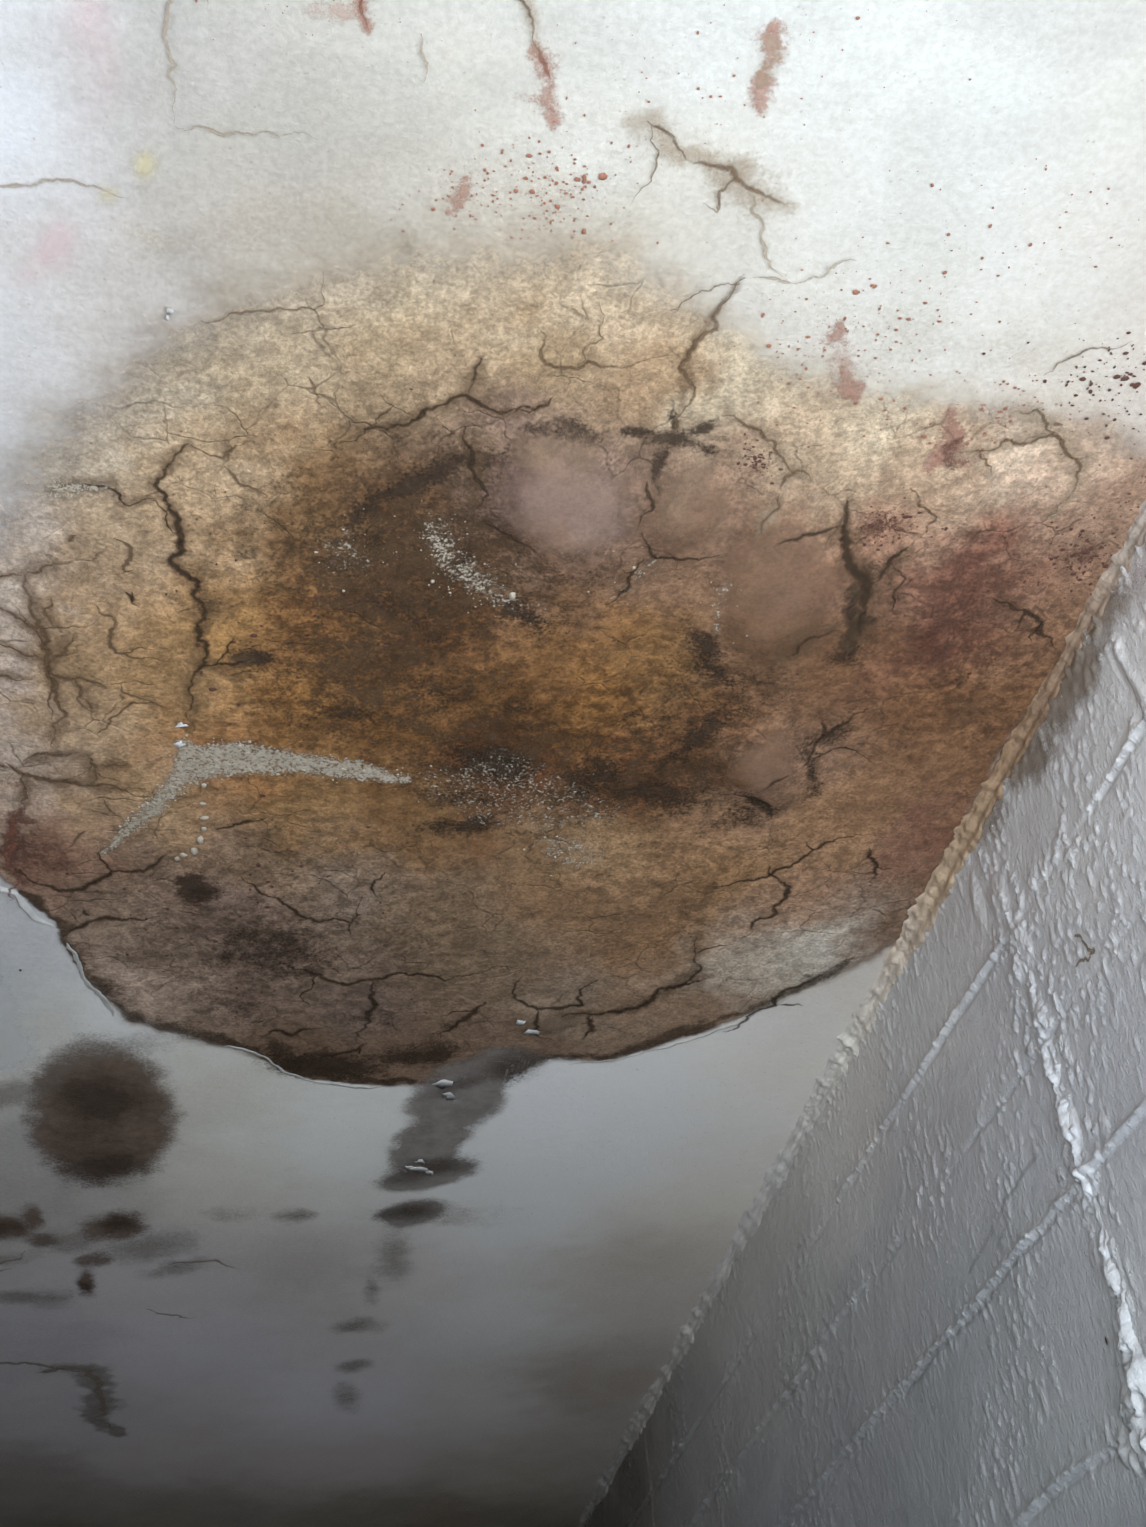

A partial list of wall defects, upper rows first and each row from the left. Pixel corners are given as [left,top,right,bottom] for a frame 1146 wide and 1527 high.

rust [354,0,379,42]
rust [732,19,815,118]
crack [345,125,852,549]
crack [1046,346,1122,374]
crack [959,409,1082,516]
crack [606,482,721,605]
crack [726,415,938,658]
crack [0,441,264,937]
damp [0,242,1146,1226]
crack [243,834,891,1057]
damp [0,1208,57,1246]
damp [75,1214,174,1293]